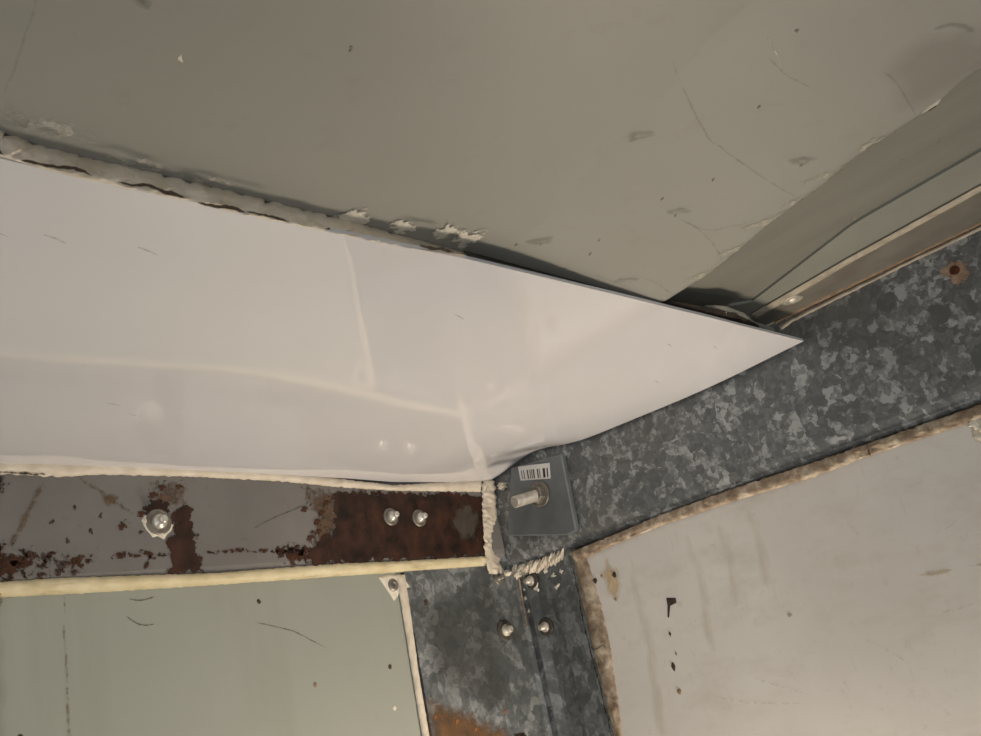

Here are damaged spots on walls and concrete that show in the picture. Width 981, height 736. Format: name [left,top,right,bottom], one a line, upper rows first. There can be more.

rust [940,260,971,284]
rust [111,480,485,574]
rust [0,543,92,582]
rust [434,706,503,736]